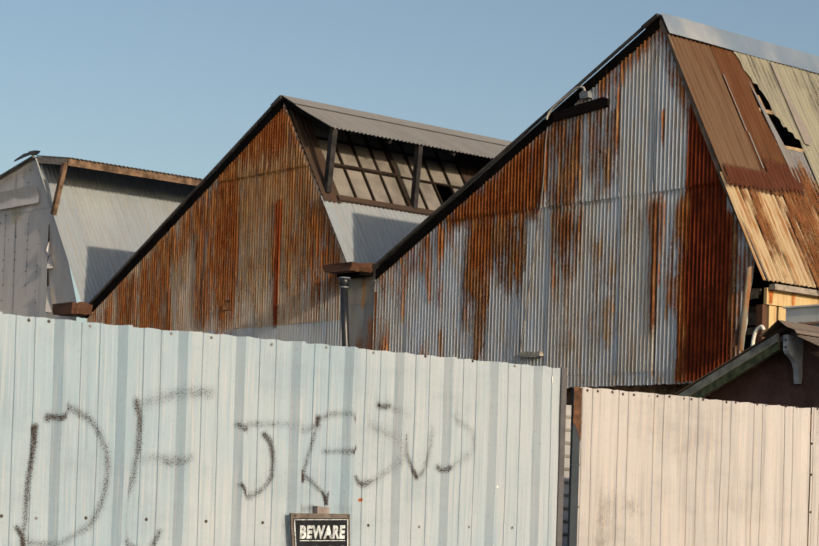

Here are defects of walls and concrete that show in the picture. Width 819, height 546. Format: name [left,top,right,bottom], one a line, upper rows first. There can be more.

corrosion [92,107,340,334]
corrosion [355,30,819,384]